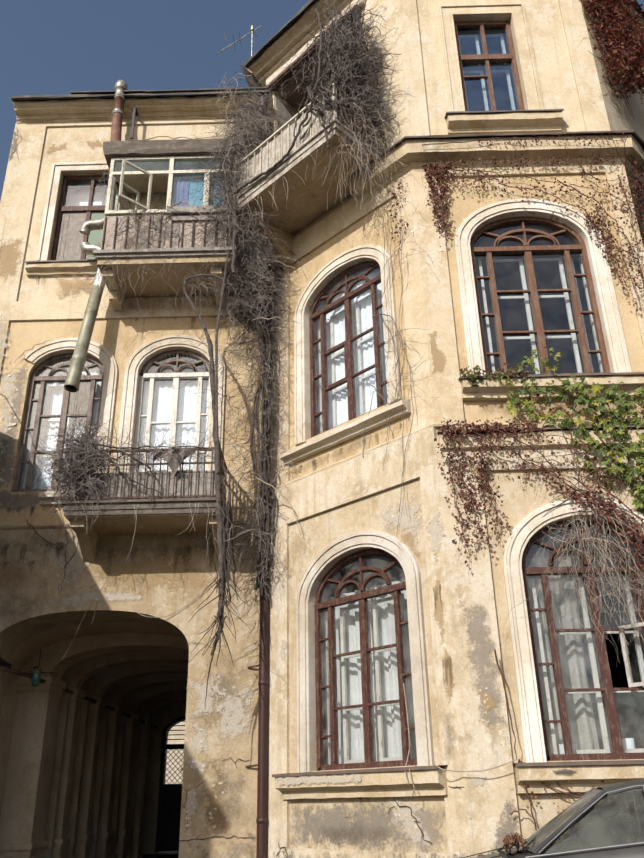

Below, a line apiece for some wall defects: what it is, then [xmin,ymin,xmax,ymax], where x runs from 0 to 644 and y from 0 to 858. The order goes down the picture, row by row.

peeling [0,238,22,279]
water stain [87,552,210,594]
peeling [184,672,259,834]
peeling [387,797,432,849]
crack [388,797,432,844]